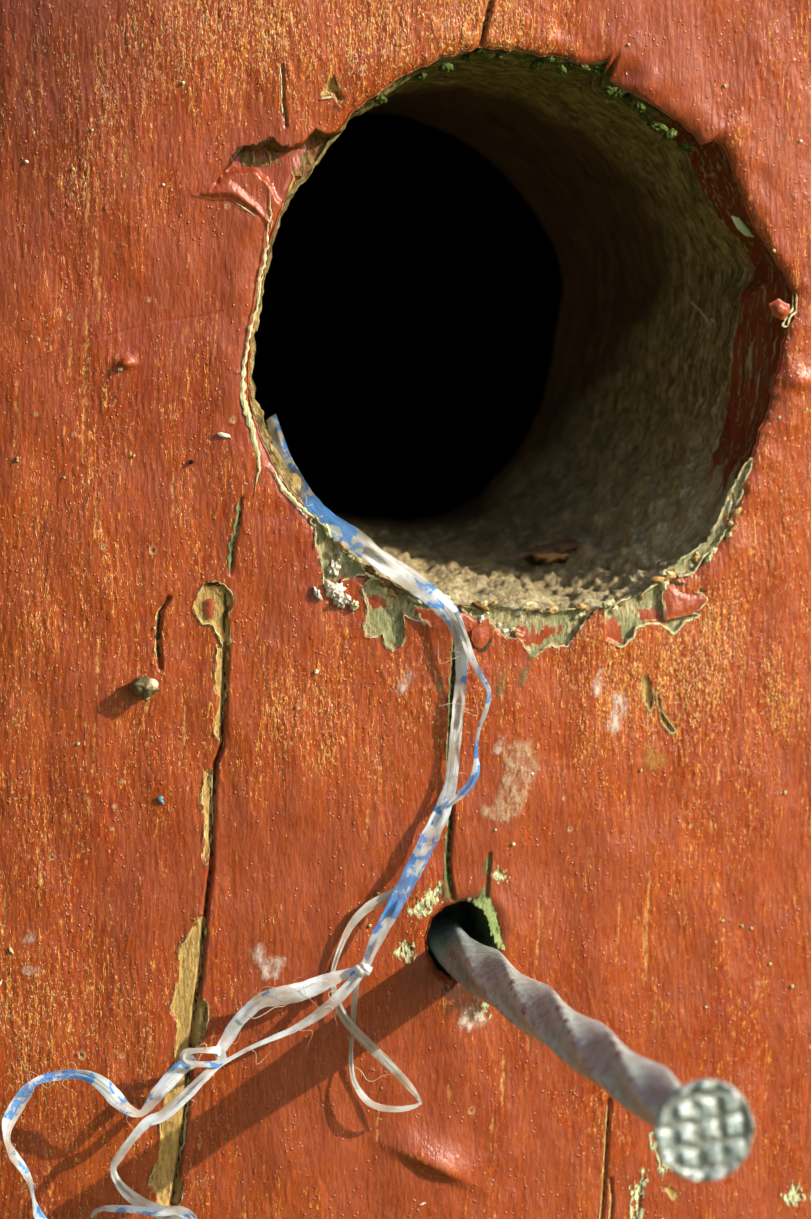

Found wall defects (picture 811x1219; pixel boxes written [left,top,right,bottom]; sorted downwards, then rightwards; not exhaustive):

spalling [223,129,342,194]
peeling [731,216,754,238]
peeling [604,458,753,648]
crack [154,598,167,667]
peeling [459,604,589,658]
crack [171,653,227,1205]
peeling [393,939,416,963]
peeling [407,881,443,920]
peeling [468,895,505,950]
peeling [629,1132,681,1219]
peeling [781,1180,811,1206]